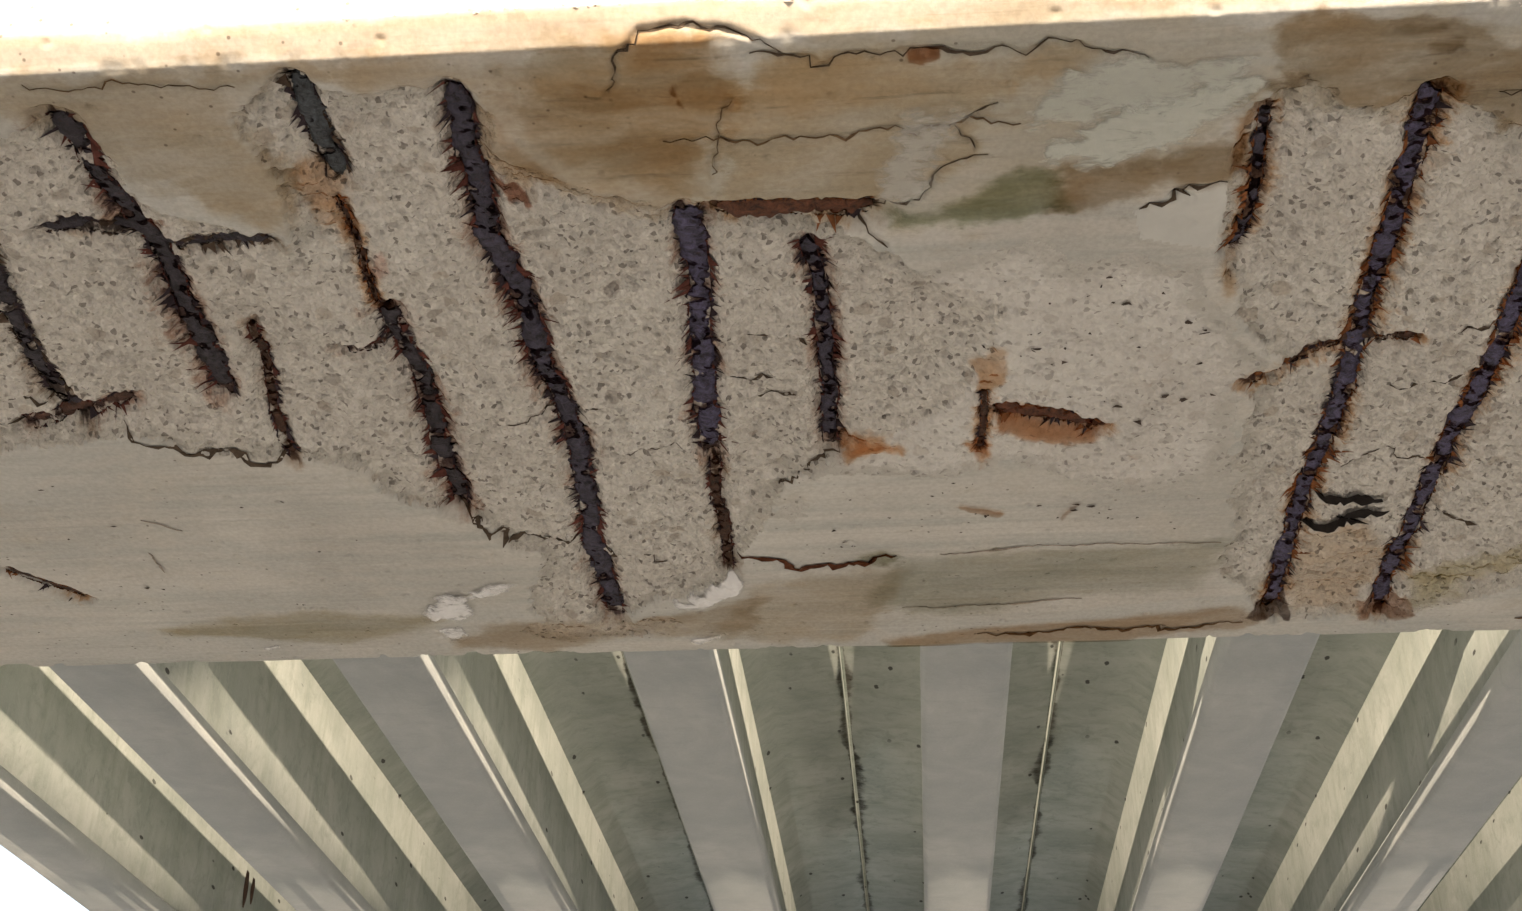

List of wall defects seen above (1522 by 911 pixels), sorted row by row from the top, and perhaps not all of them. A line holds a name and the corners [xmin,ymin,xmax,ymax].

crack [663,101,1021,248]
crack [606,20,1150,91]
damp [883,119,959,201]
damp [1032,55,1268,168]
spalling [0,68,1188,642]
spalling [1132,74,1522,622]
corrosion [1249,591,1290,621]